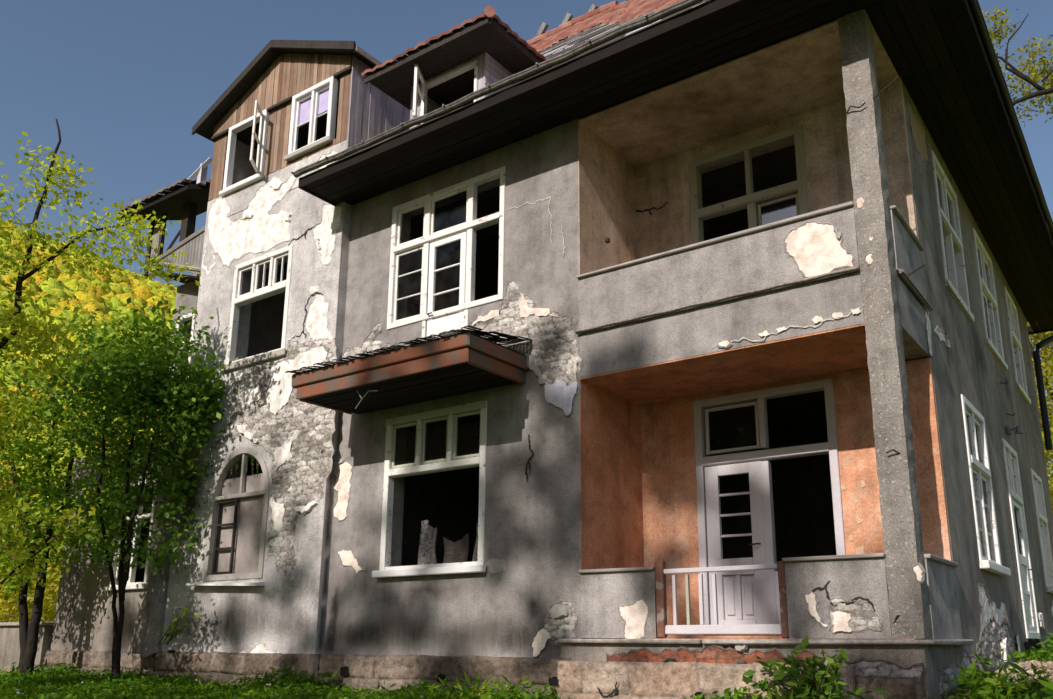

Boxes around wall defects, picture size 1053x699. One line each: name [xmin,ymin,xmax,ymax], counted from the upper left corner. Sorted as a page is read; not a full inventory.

peeling [202,174,297,275]
peeling [312,203,343,266]
crack [636,202,668,215]
peeling [783,221,879,278]
crack [291,293,323,339]
flaking render [469,280,584,418]
peeling [711,307,862,349]
flaking render [207,285,414,587]
crack [525,435,534,482]
spalling [911,562,925,584]
flaking render [532,599,578,657]
spalling [606,583,1053,699]